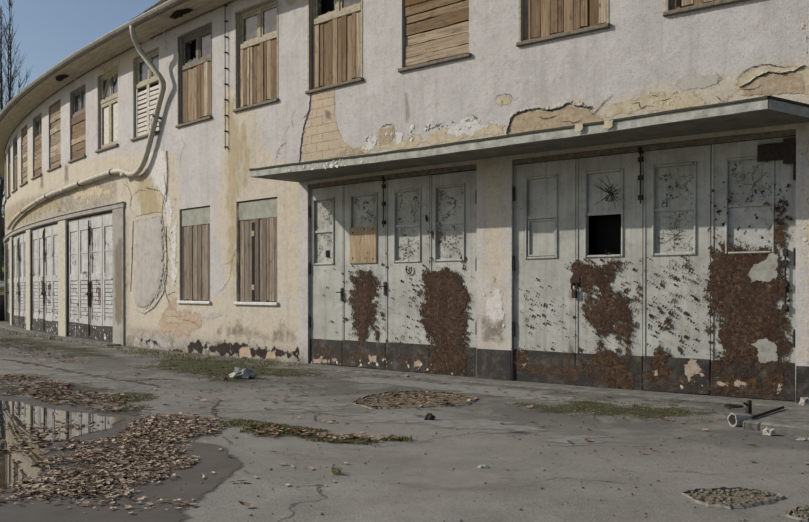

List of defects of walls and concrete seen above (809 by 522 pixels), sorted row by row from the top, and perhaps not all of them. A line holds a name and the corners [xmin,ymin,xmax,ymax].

flaking render [299,73,722,170]
spalling [716,64,809,104]
peeling [141,149,178,286]
flaking render [134,298,300,361]
rust [315,247,475,378]
rust [513,181,793,400]